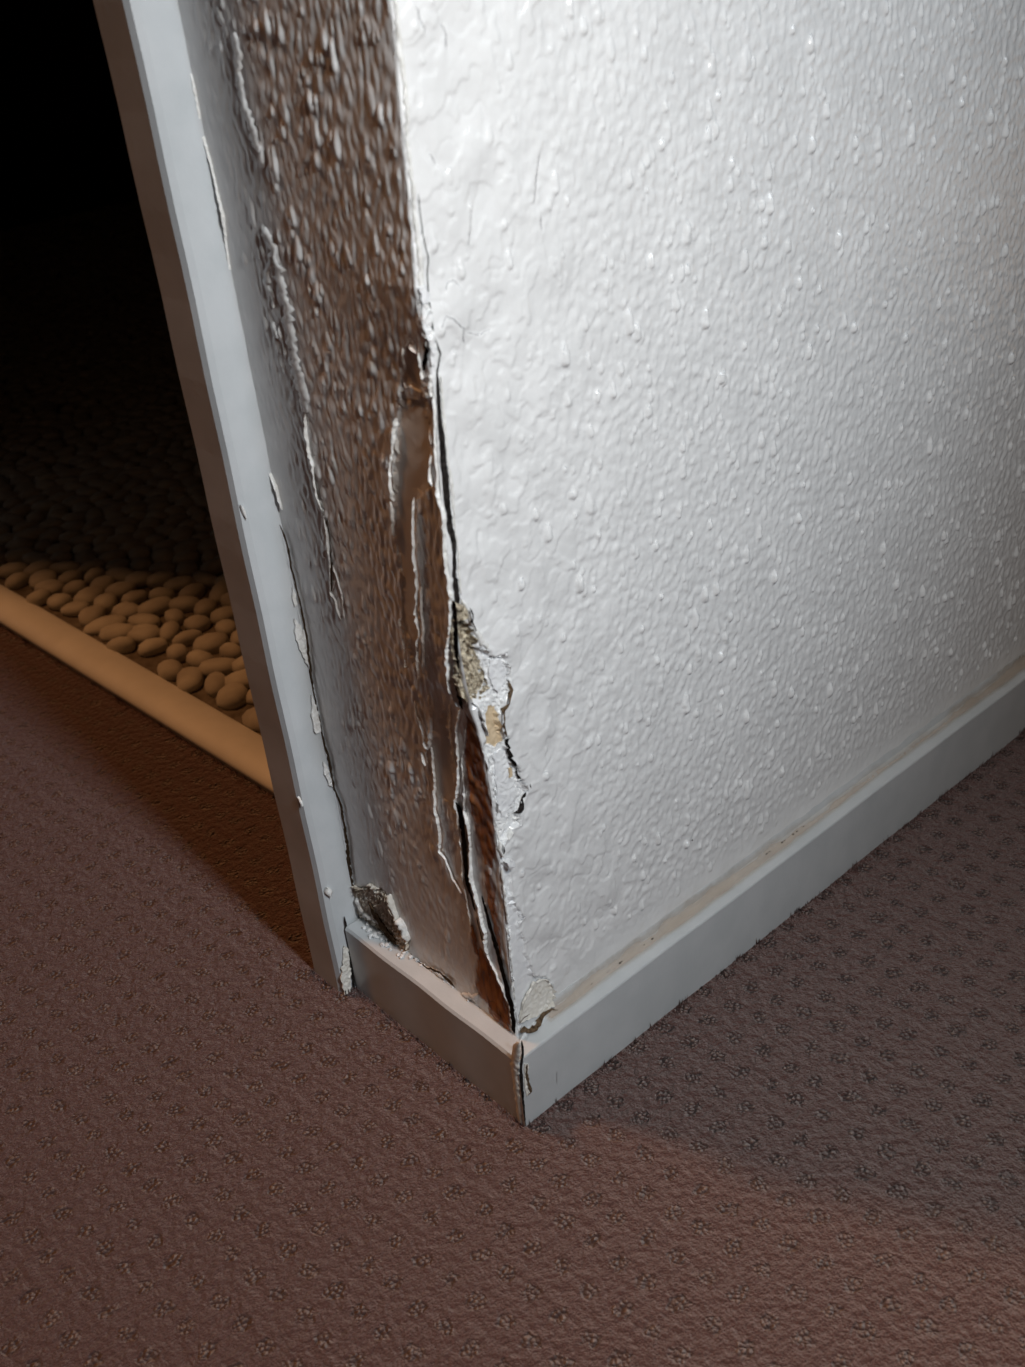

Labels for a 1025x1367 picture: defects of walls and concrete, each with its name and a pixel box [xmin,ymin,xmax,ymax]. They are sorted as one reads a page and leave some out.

spalling [340,883,425,995]
peeling [388,0,462,894]
crack [413,199,555,1123]
spalling [449,599,556,1033]